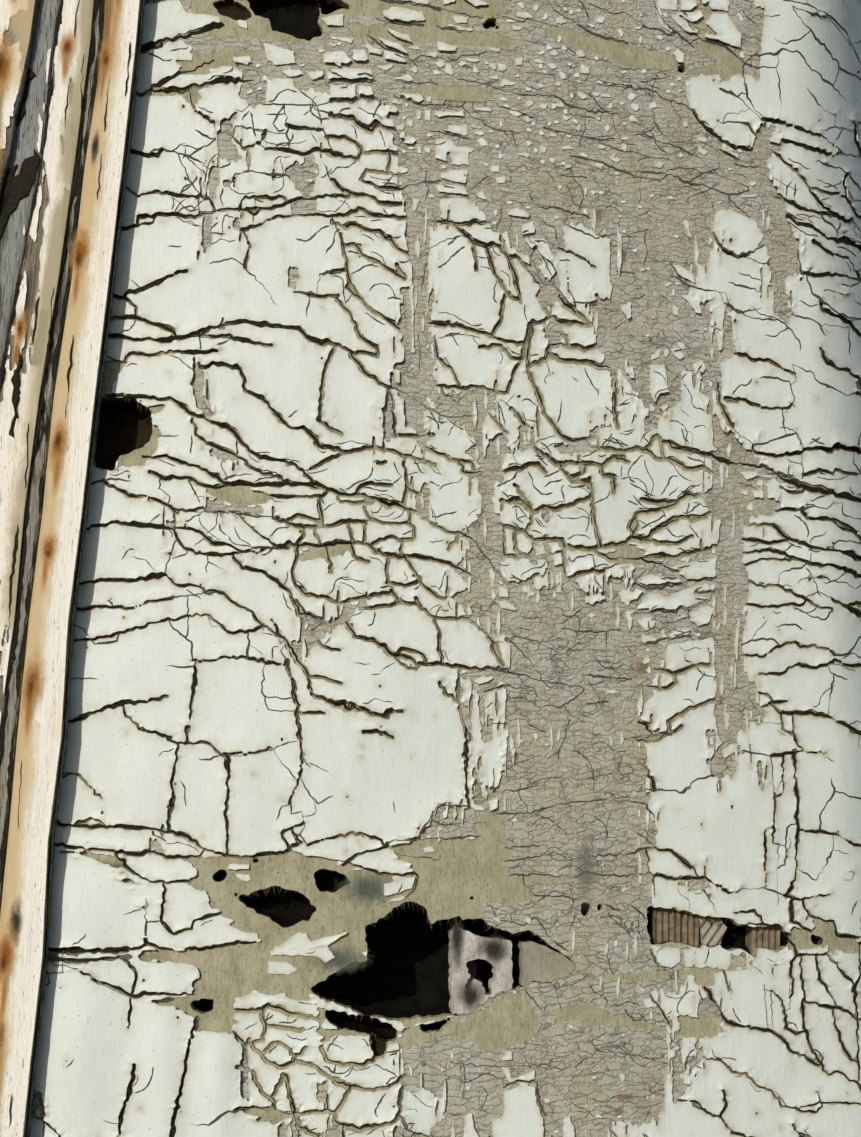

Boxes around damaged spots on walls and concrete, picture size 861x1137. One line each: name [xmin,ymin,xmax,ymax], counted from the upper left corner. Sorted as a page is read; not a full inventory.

rust [0,39,12,114]
rust [60,35,74,78]
crack [136,60,254,139]
peeling [109,319,172,339]
peeling [321,492,412,544]
peeling [0,0,140,1137]
peeling [389,559,416,584]
crack [46,94,861,1026]
rust [23,662,41,732]
crack [491,623,861,1113]
rust [0,933,13,1025]
crack [171,1004,434,1137]